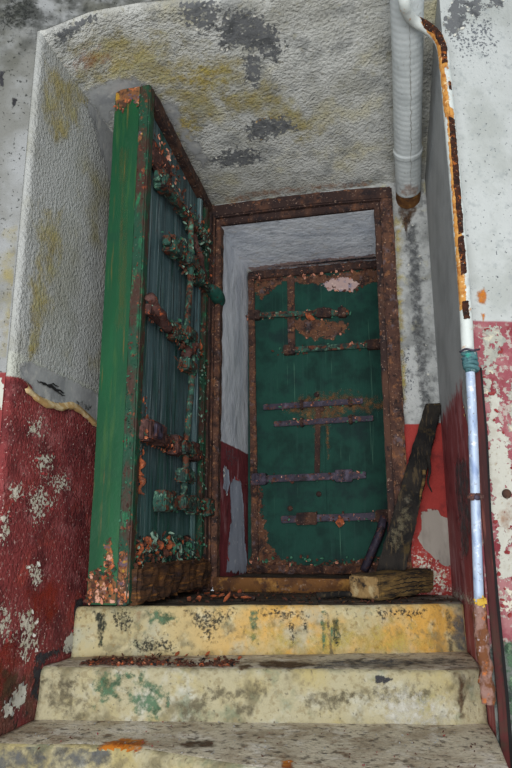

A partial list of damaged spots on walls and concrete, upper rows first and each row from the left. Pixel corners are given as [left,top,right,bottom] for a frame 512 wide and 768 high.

rust [295,318,349,341]
peeling [479,324,512,618]
peeling [0,451,72,546]
peeling [223,466,380,574]
peeling [414,508,451,594]
peeling [26,561,44,587]
peeling [0,605,45,664]
damp [94,611,133,647]
damp [130,632,175,655]
damp [192,609,237,643]
peeling [1,681,27,718]
rust [99,738,147,752]